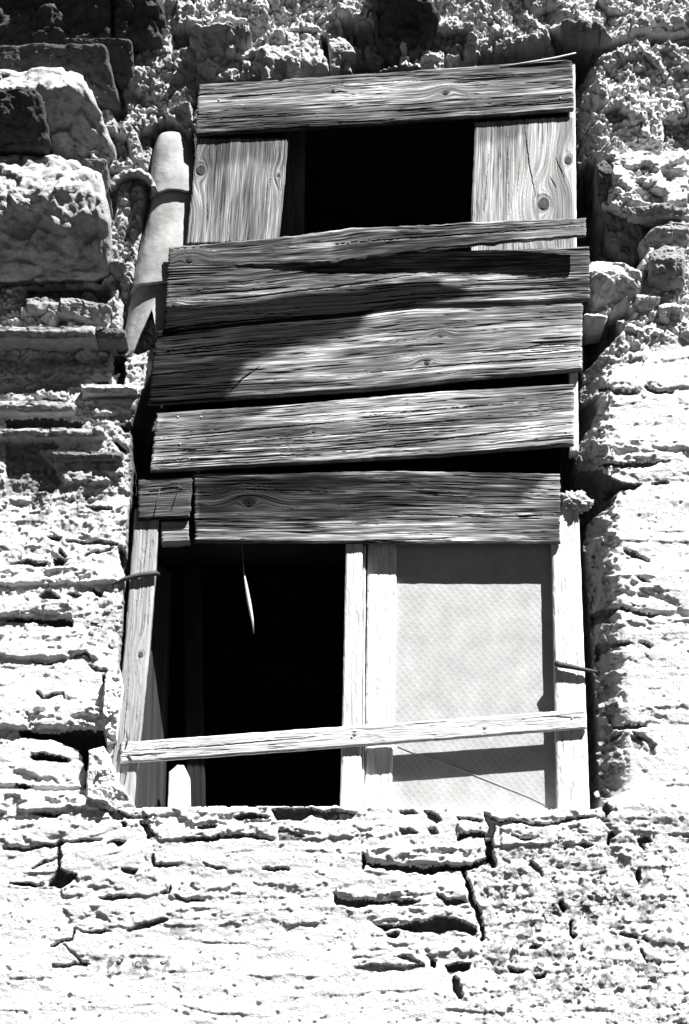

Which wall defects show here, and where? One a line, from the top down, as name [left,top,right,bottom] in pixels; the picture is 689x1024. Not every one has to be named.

crack [461,814,594,942]